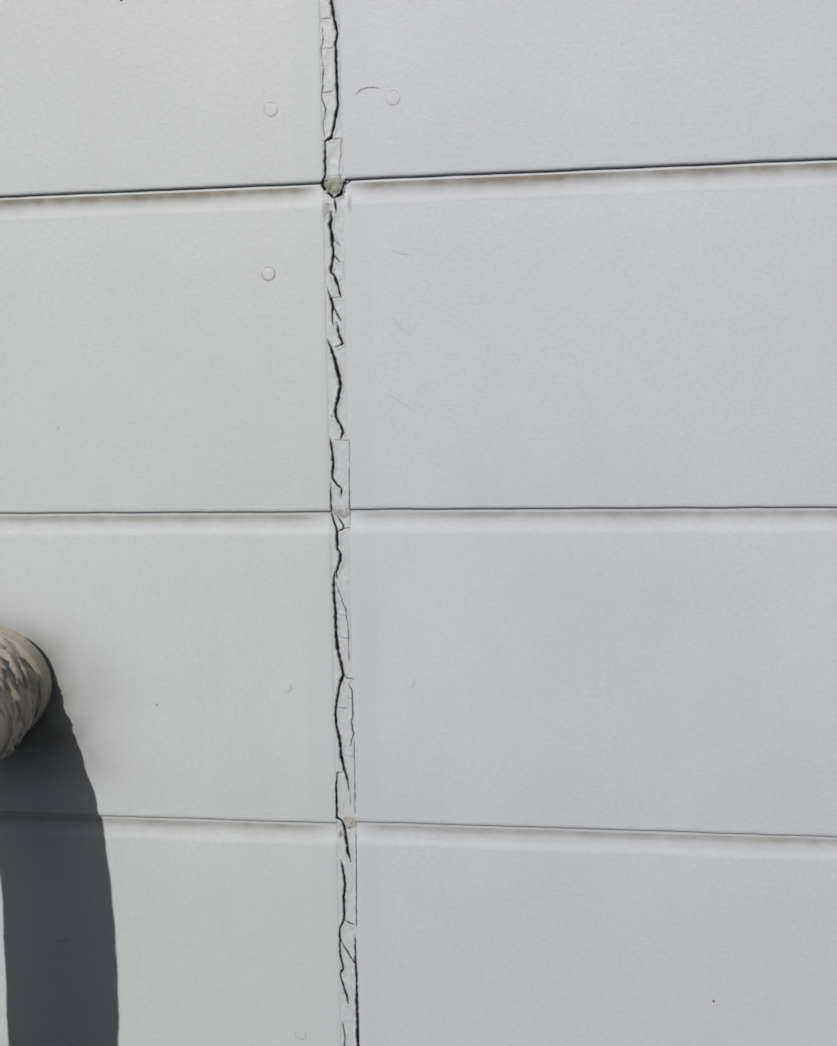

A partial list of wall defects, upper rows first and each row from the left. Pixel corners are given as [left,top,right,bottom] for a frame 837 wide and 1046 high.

crack [321,0,359,1046]